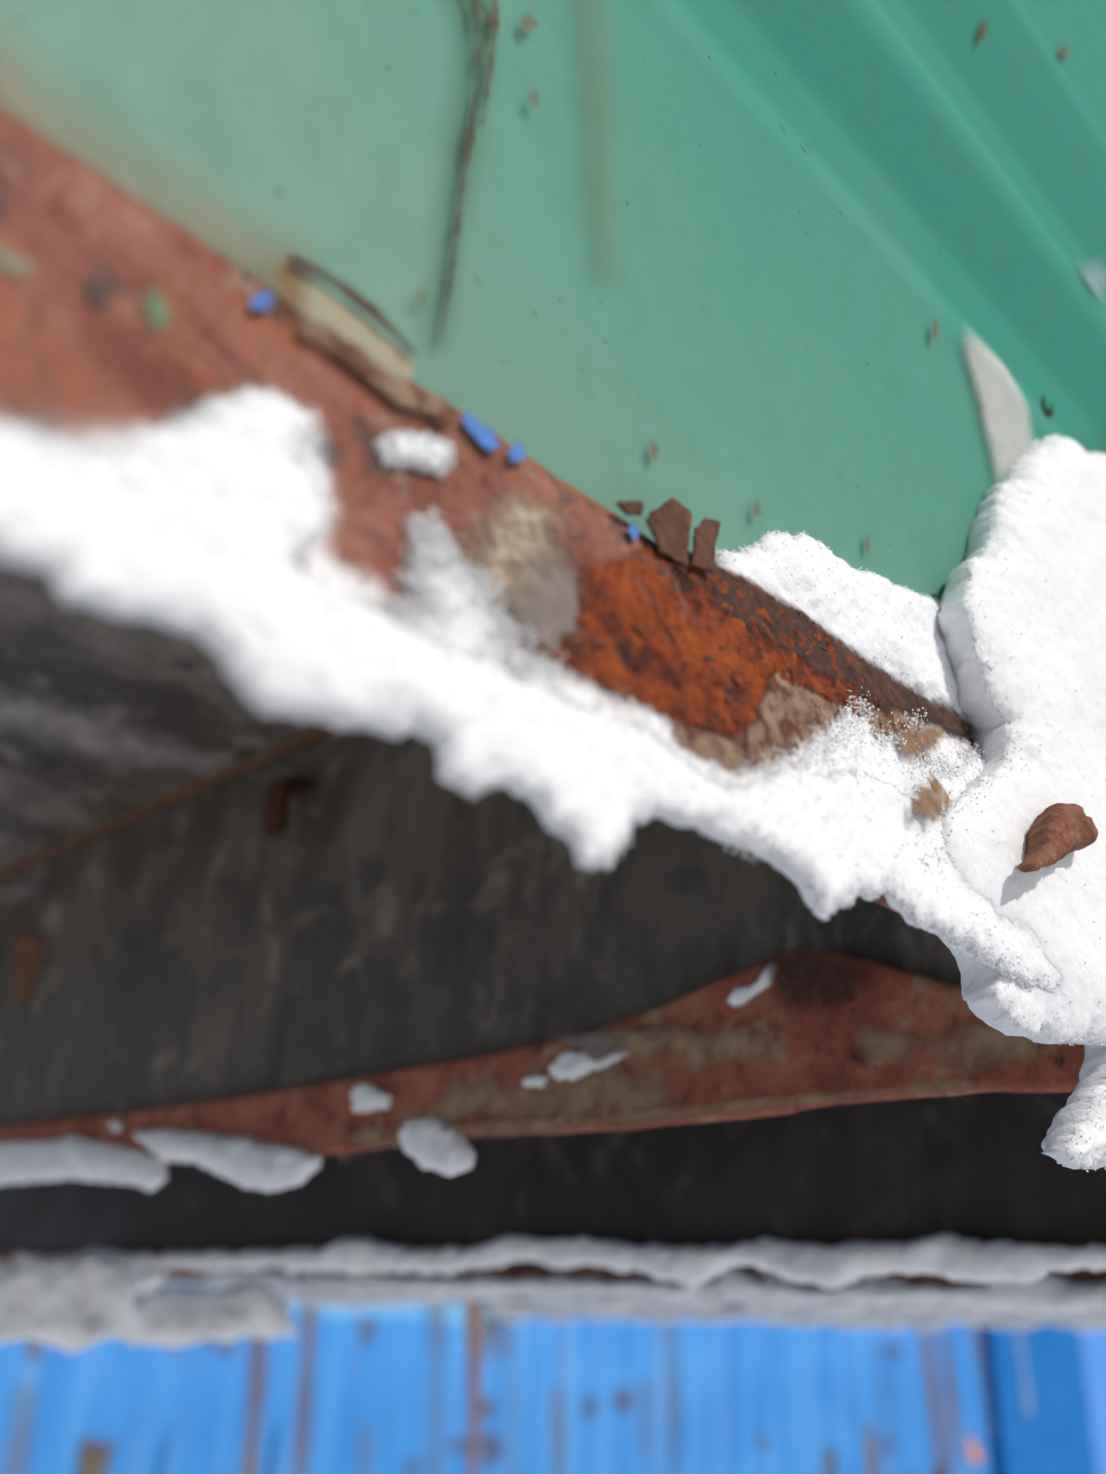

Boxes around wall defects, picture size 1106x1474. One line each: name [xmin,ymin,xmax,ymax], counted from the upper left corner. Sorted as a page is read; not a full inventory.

corrosion [0,60,270,276]
corrosion [517,498,975,736]
corrosion [769,953,862,1006]
corrosion [79,1442,111,1474]
corrosion [245,1338,264,1474]
corrosion [299,1305,314,1474]
corrosion [460,1303,498,1474]